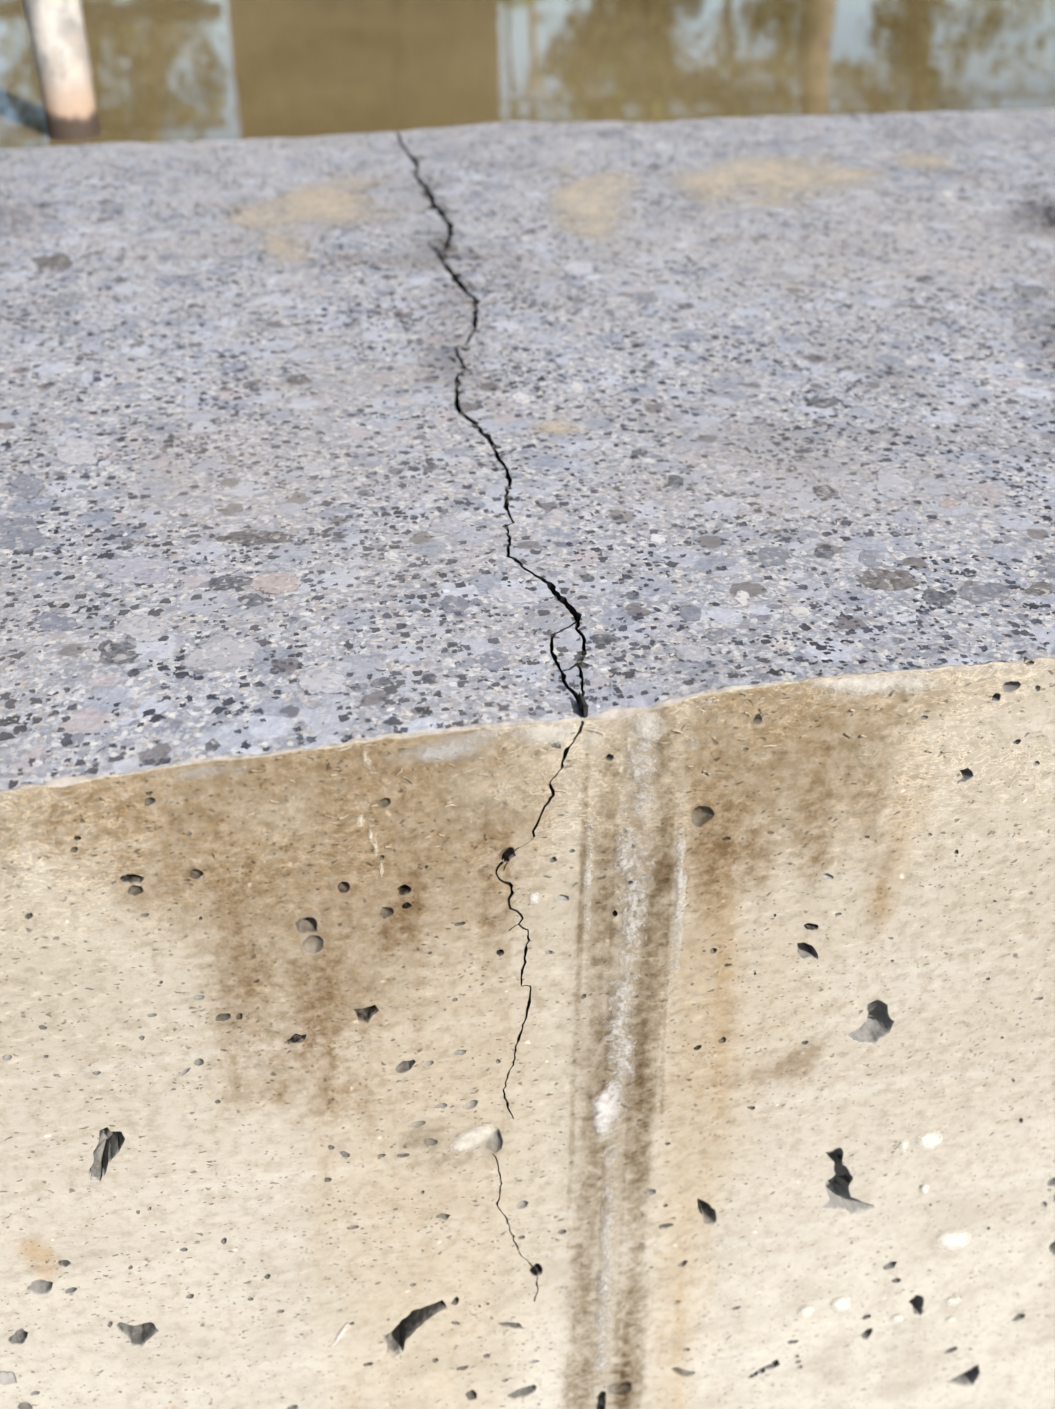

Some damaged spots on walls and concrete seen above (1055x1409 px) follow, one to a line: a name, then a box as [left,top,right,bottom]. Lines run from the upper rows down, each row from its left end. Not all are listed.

crack [395,133,589,1119]
damp [420,733,493,759]
damp [524,725,572,743]
damp [632,712,661,807]
damp [675,830,687,966]
damp [595,828,646,1162]
crack [493,1154,539,1302]
damp [595,1188,613,1367]